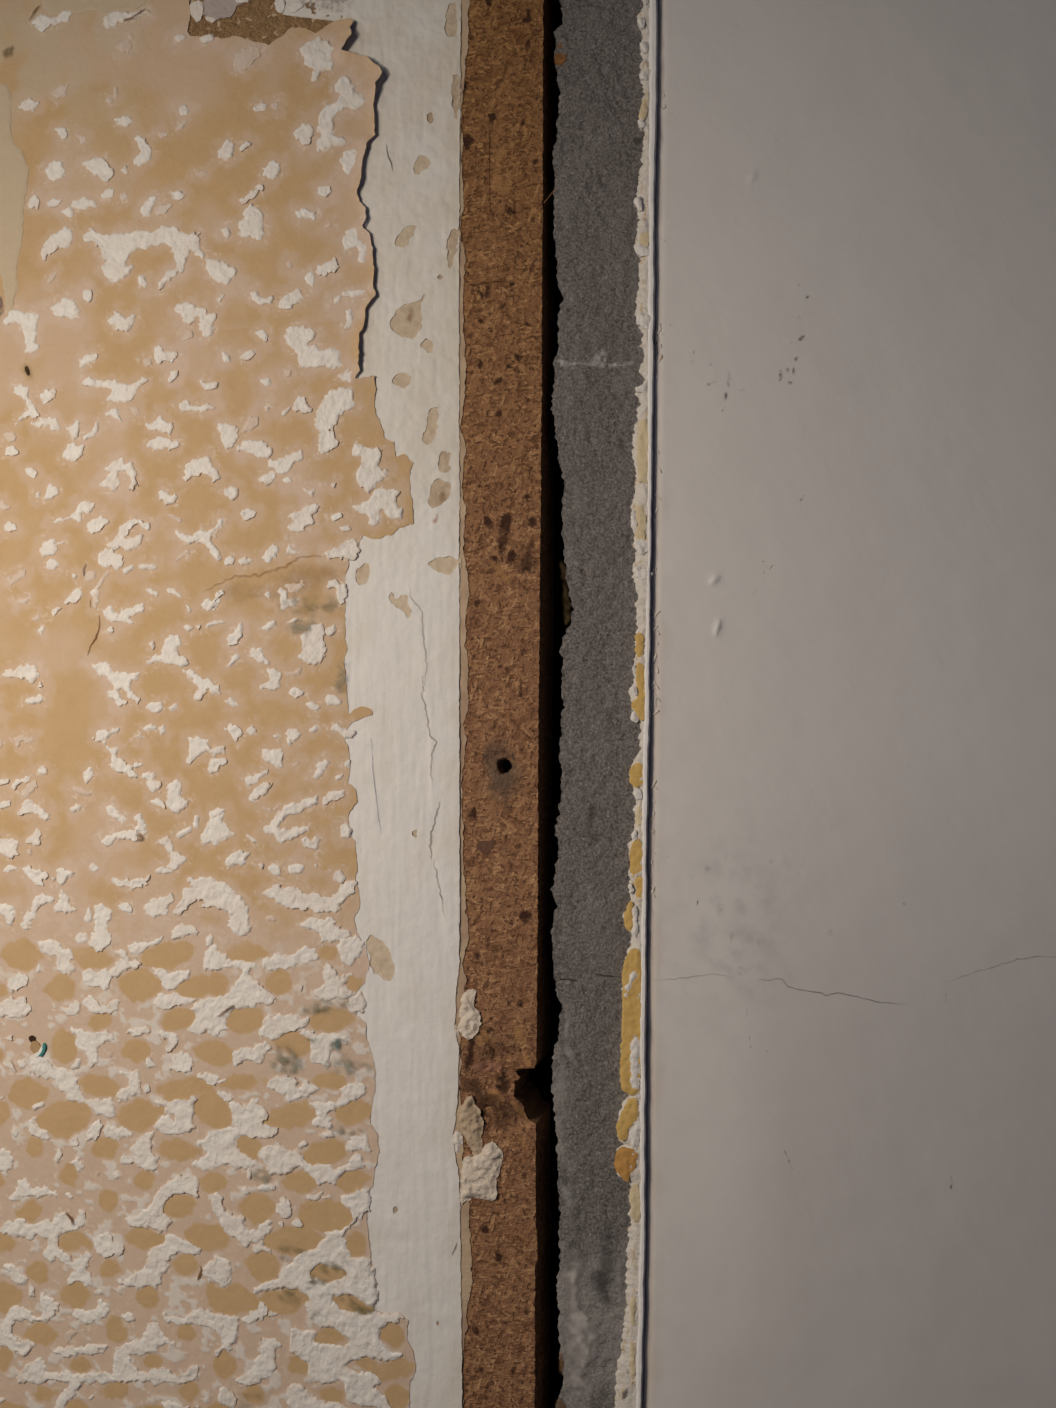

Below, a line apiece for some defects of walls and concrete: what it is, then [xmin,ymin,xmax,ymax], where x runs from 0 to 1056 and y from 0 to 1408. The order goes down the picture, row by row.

peeling [31,10,72,33]
peeling [103,10,149,54]
peeling [175,34,214,44]
peeling [293,36,365,174]
peeling [395,225,417,248]
peeling [3,84,403,605]
peeling [390,294,434,353]
peeling [392,373,411,389]
peeling [389,593,411,618]
peeling [0,500,404,1408]